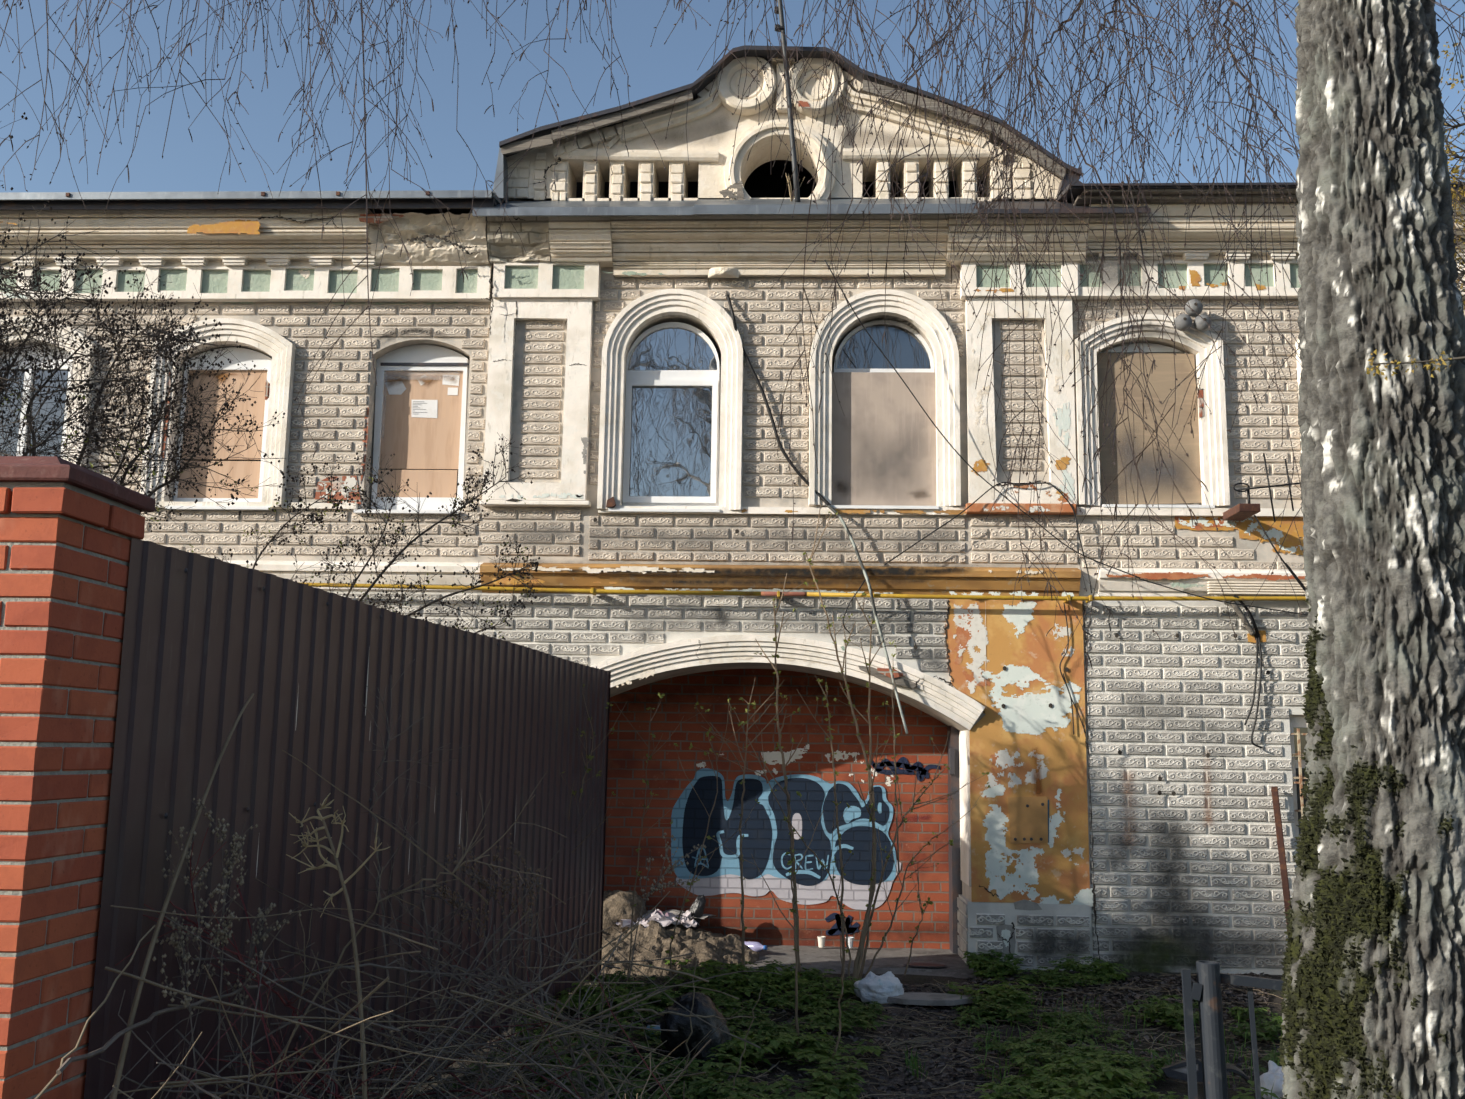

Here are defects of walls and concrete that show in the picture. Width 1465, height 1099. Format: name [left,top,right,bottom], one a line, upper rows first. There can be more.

peeling [187,209,336,235]
crack [407,229,517,362]
peeling [1174,516,1304,555]
peeling [492,566,893,594]
peeling [1106,572,1305,589]
peeling [949,591,1094,955]
damp [1117,826,1266,967]